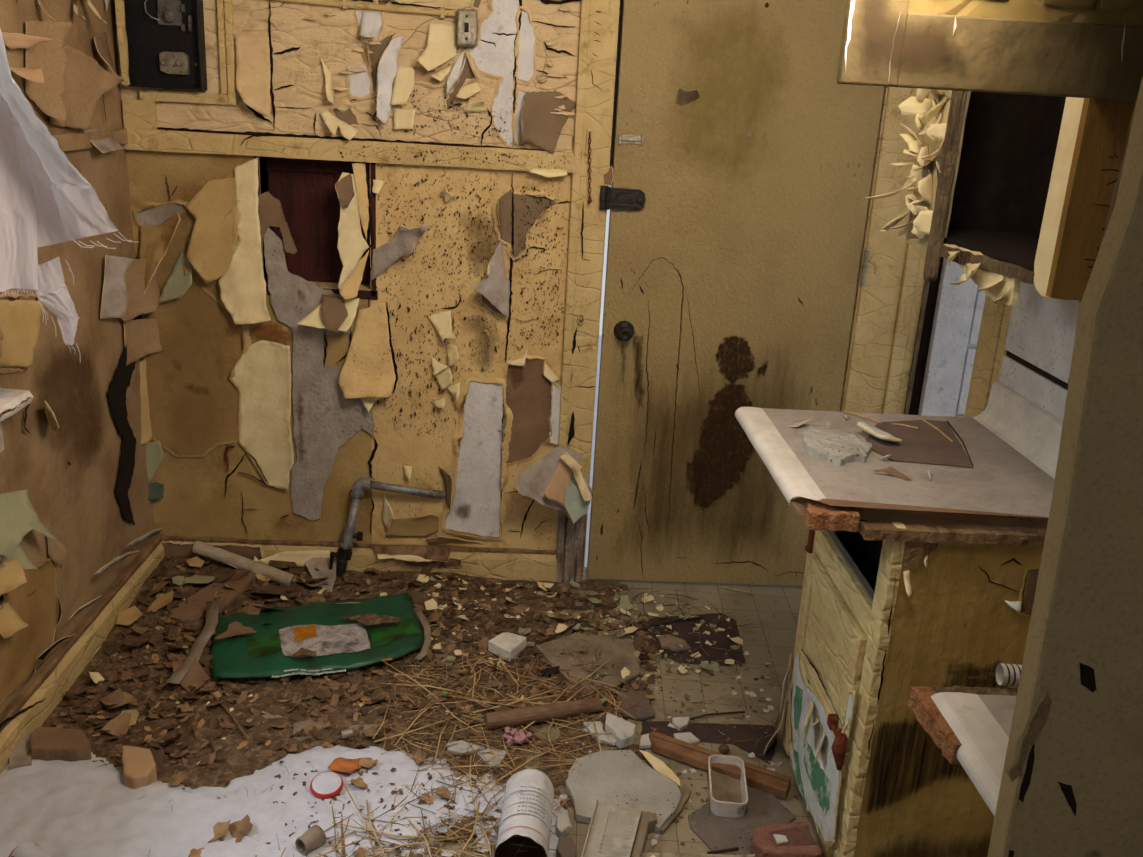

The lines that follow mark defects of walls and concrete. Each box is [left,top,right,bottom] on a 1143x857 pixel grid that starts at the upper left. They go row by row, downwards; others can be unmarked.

peeling [2,0,127,153]
crack [241,1,316,152]
crack [349,96,381,135]
peeling [320,0,576,153]
crack [225,451,268,535]
spalling [95,156,430,576]
peeling [370,311,593,570]
leakage [653,336,771,543]
crack [979,558,1022,592]
leakage [944,662,1006,689]
leakage [867,719,968,812]
leakage [880,839,990,857]